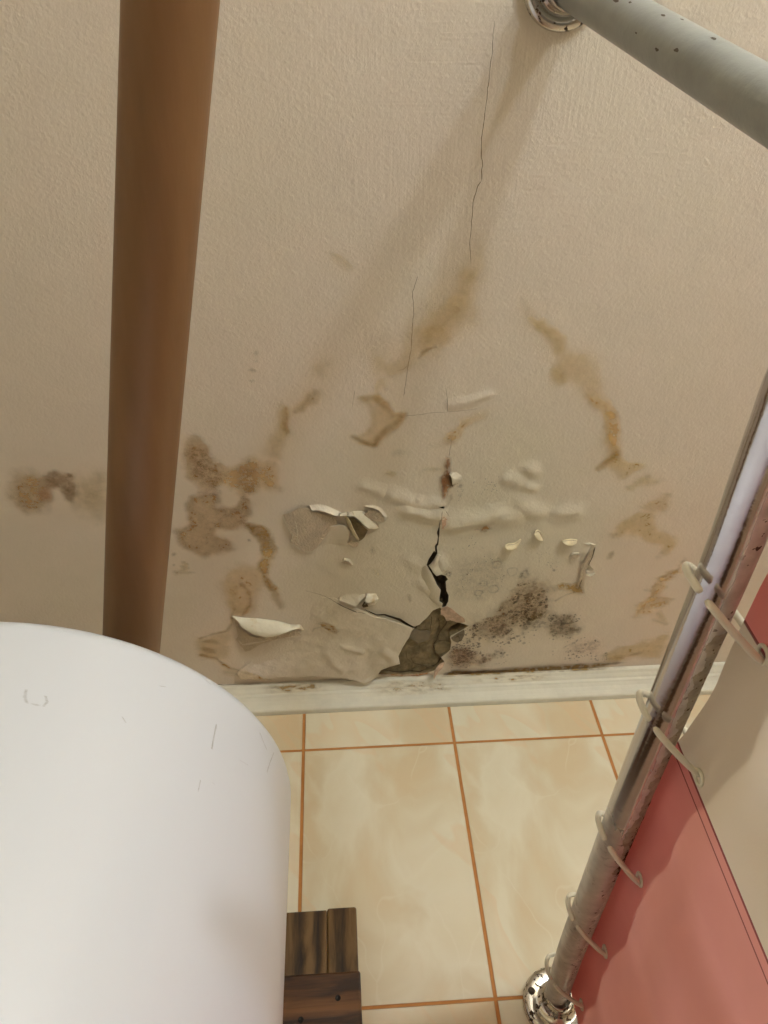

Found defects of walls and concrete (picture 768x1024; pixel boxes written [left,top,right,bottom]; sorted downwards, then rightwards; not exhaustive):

crack [469,21,495,260]
peeling [282,504,387,565]
peeling [232,554,468,684]
crack [308,591,417,628]
crack [427,507,449,607]
leakage [445,573,617,680]